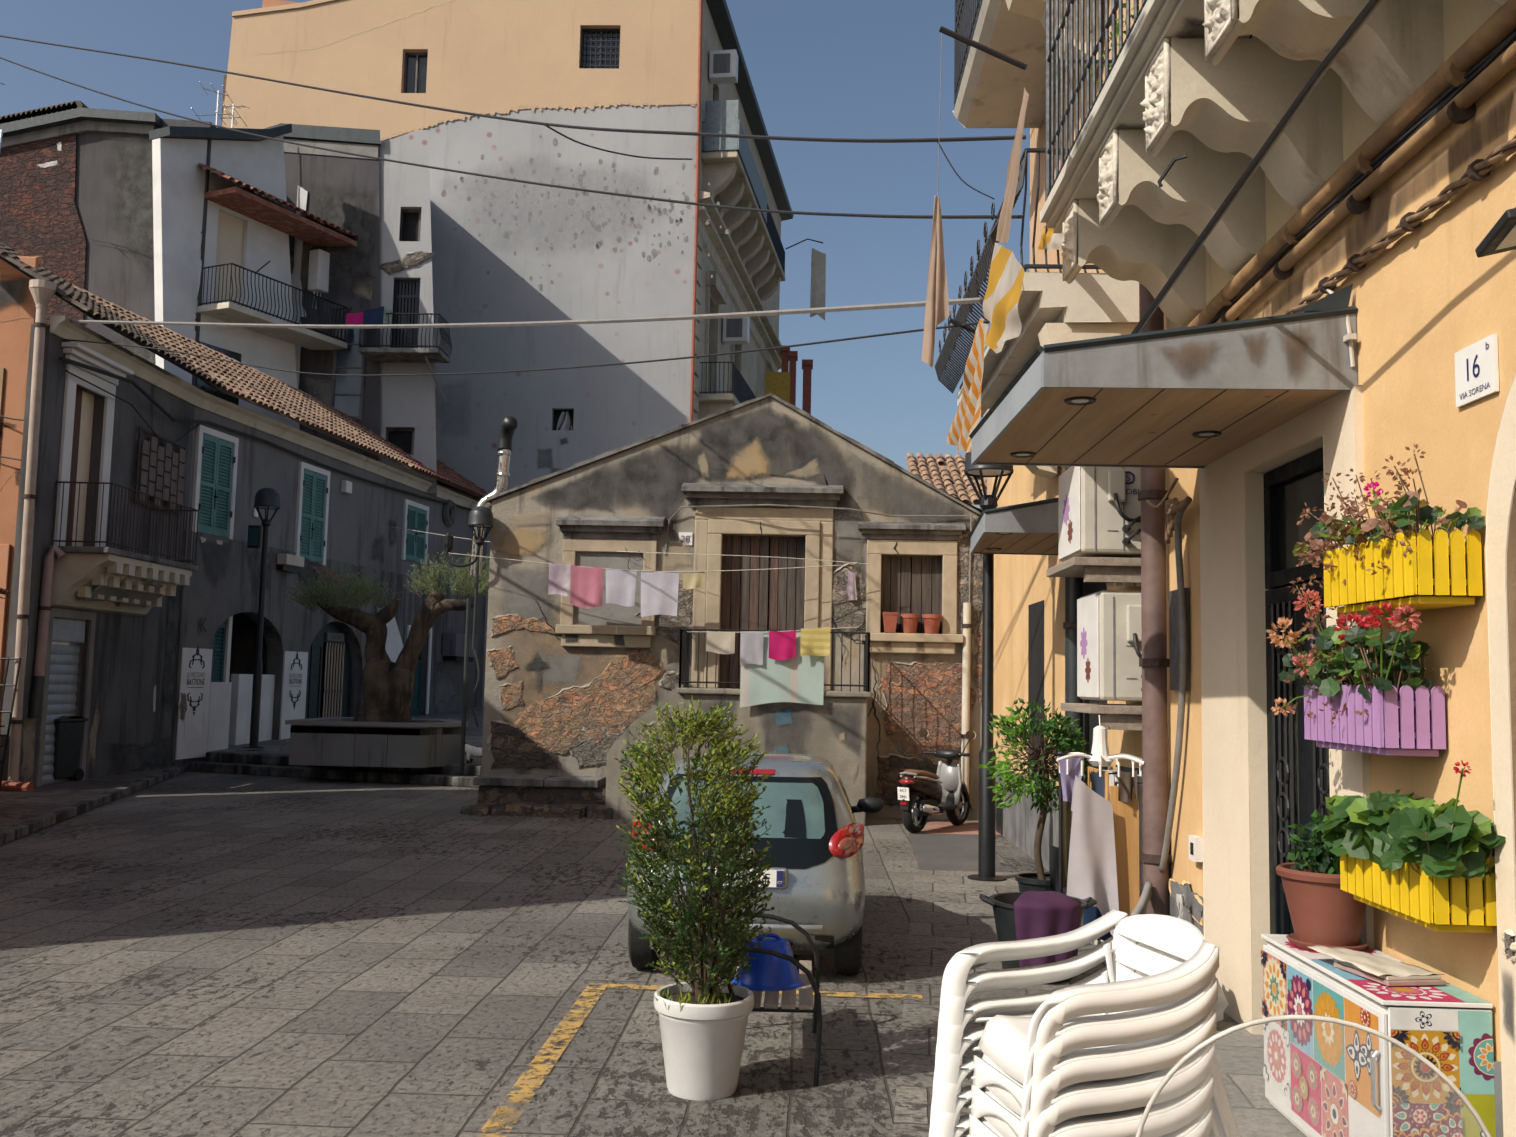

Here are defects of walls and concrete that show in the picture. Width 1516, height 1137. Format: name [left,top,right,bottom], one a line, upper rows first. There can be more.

damp [538,408,975,572]
flaking render [486,580,693,772]
flaking render [872,532,983,810]